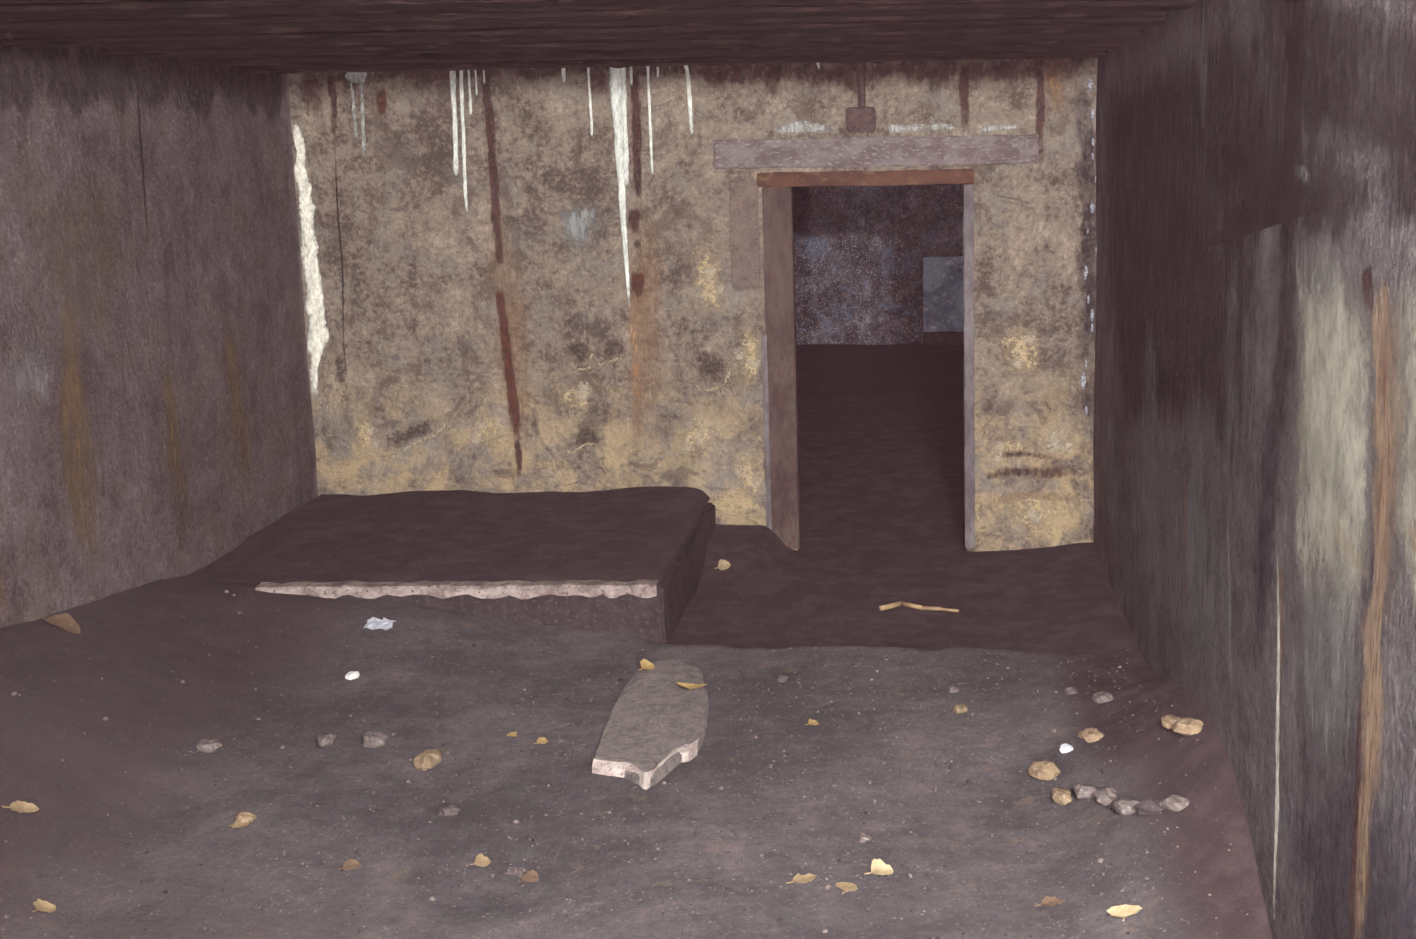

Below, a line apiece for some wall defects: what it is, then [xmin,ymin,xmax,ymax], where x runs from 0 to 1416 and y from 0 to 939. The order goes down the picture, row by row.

water stain [0,44,281,120]
water stain [293,124,329,392]
corrosion [482,75,503,263]
corrosion [496,293,522,474]
corrosion [628,75,642,247]
corrosion [630,274,645,405]
water stain [299,58,1084,297]
corrosion [1350,269,1392,939]